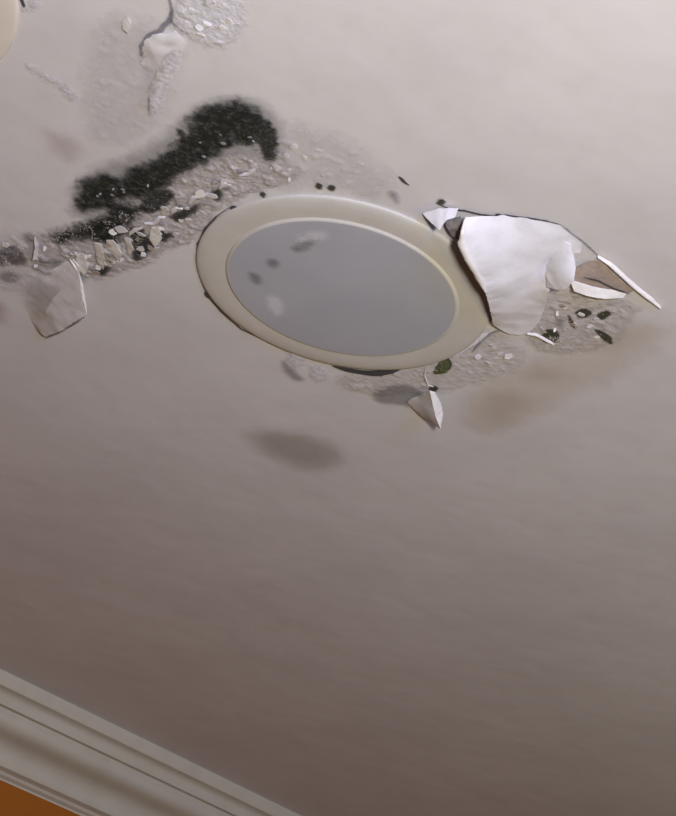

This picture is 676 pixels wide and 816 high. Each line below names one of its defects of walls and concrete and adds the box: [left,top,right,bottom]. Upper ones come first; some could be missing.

crack [140,0,182,55]
peeling [174,0,246,46]
flaking render [2,144,307,338]
damp [53,100,278,261]
peeling [342,208,661,429]